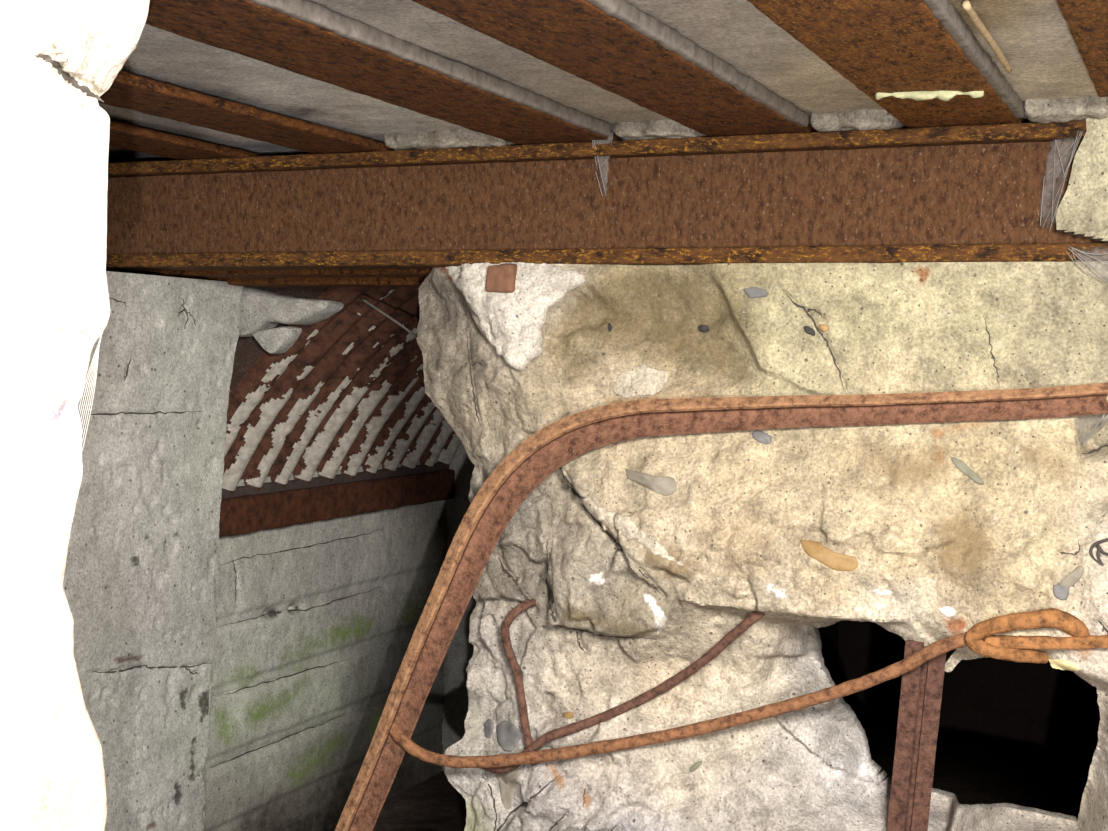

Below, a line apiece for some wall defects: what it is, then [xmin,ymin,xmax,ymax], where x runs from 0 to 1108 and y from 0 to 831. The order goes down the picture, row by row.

crack [782,289,846,392]
peeling [222,322,461,491]
crack [1081,444,1108,455]
crack [482,774,559,831]
crack [549,788,586,831]